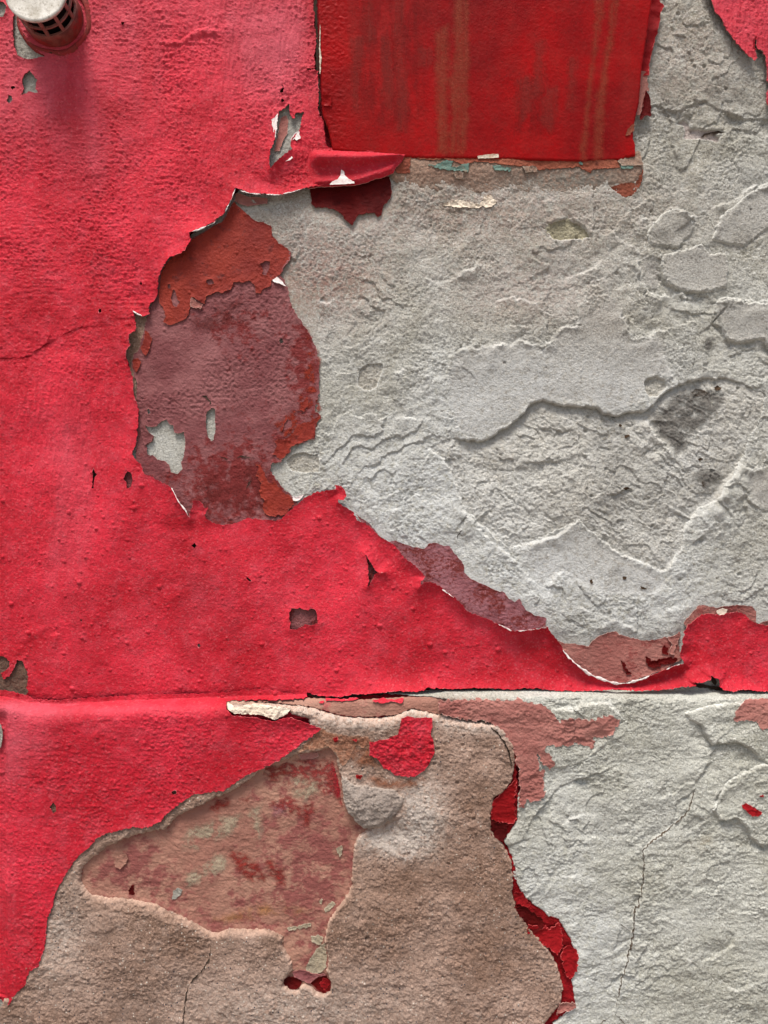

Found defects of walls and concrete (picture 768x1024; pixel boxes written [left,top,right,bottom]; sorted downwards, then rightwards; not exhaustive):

peeling [0,2,44,103]
spalling [126,0,768,683]
peeling [0,656,28,695]
crack [307,687,539,699]
crack [695,676,755,691]
spalling [0,678,768,1024]
crack [601,792,694,1024]